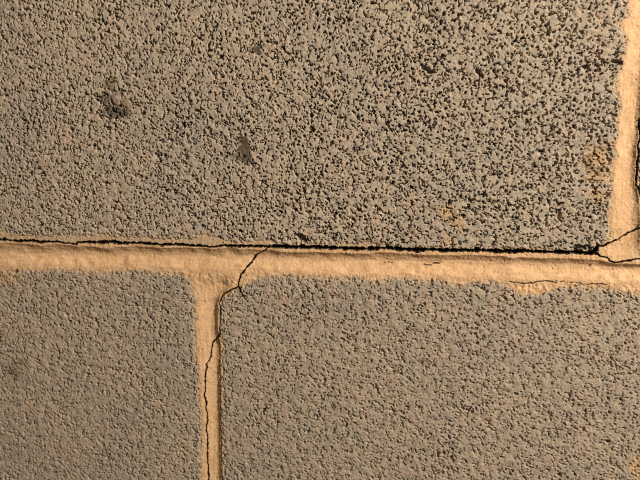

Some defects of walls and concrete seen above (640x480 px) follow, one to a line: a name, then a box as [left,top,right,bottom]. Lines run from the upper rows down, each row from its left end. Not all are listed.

crack [0,227,640,480]